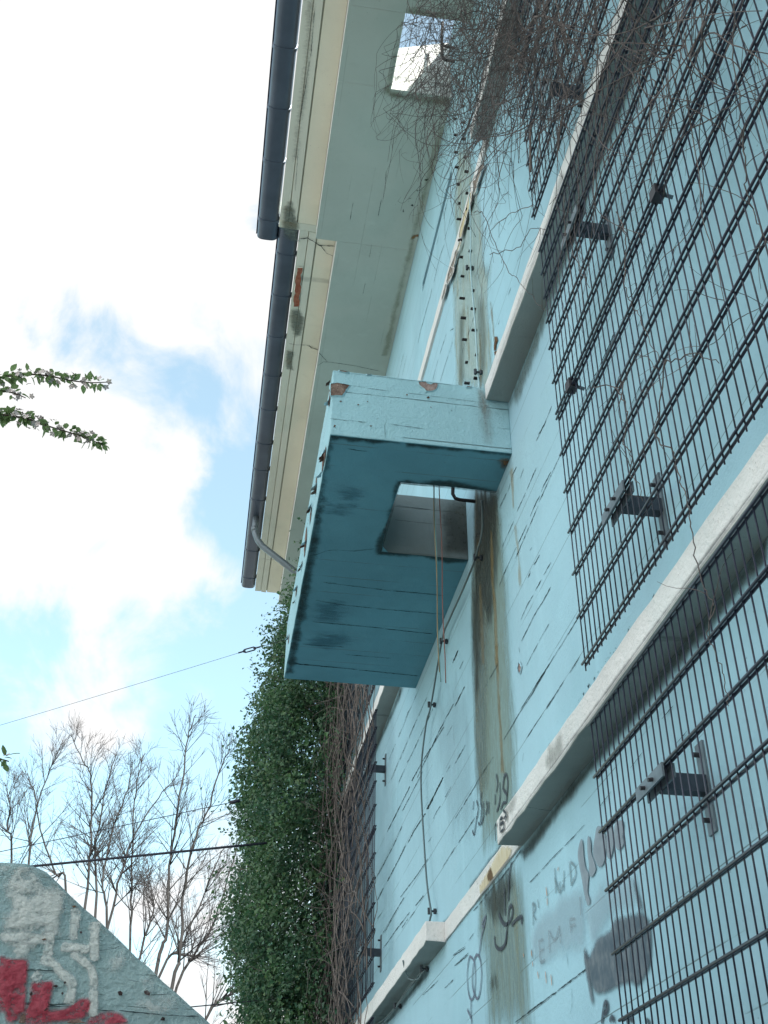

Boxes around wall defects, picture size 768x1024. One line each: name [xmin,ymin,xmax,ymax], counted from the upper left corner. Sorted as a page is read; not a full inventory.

mould [283,202,298,241]
damp [454,151,491,387]
damp [377,481,520,838]
damp [480,869,528,1023]